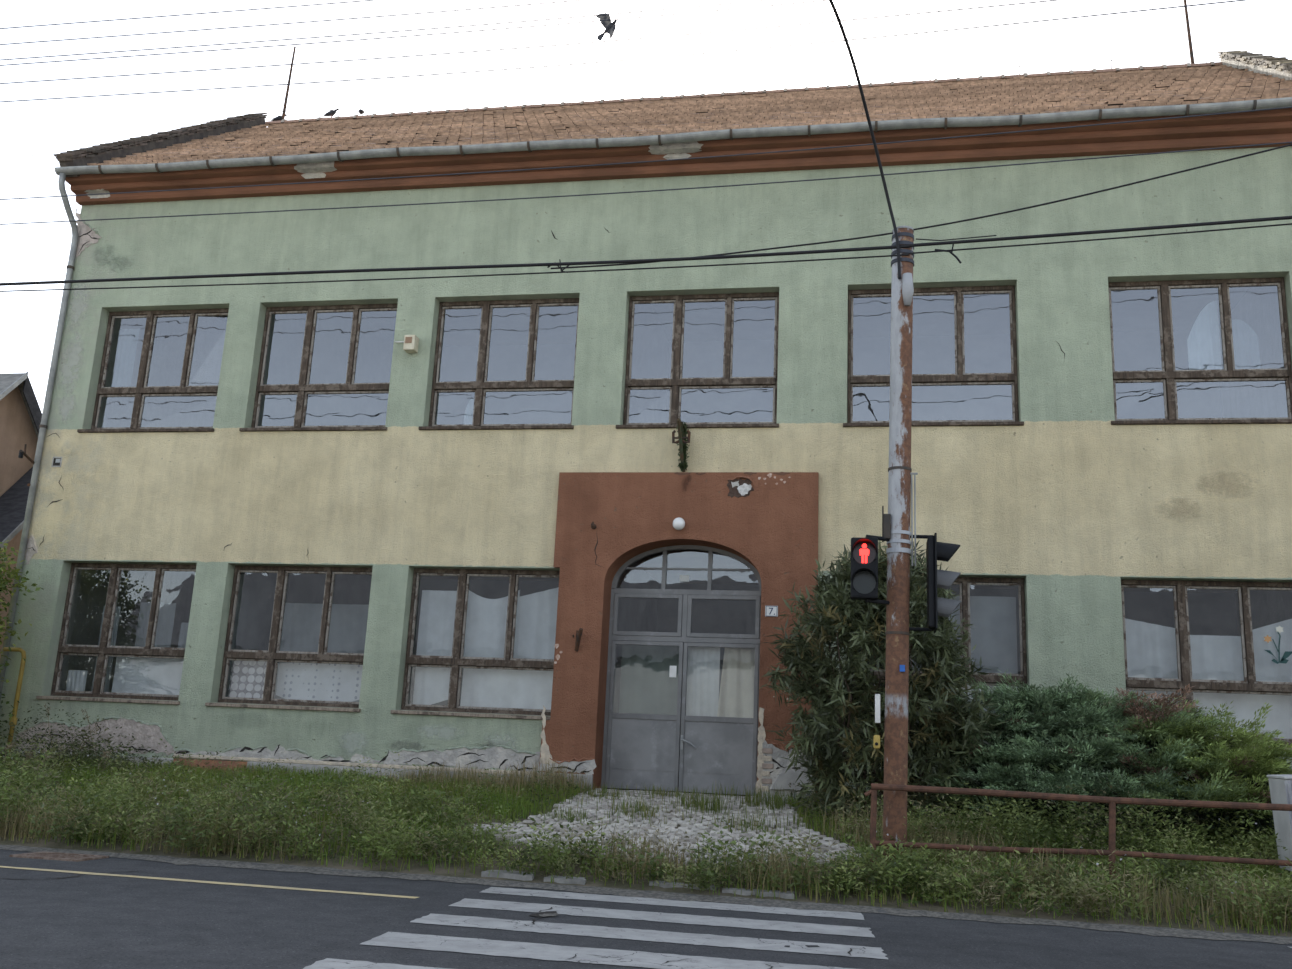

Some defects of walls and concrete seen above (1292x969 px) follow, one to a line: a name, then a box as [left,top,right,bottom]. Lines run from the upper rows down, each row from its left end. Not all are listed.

spalling [15,705,597,775]
spalling [755,707,815,797]